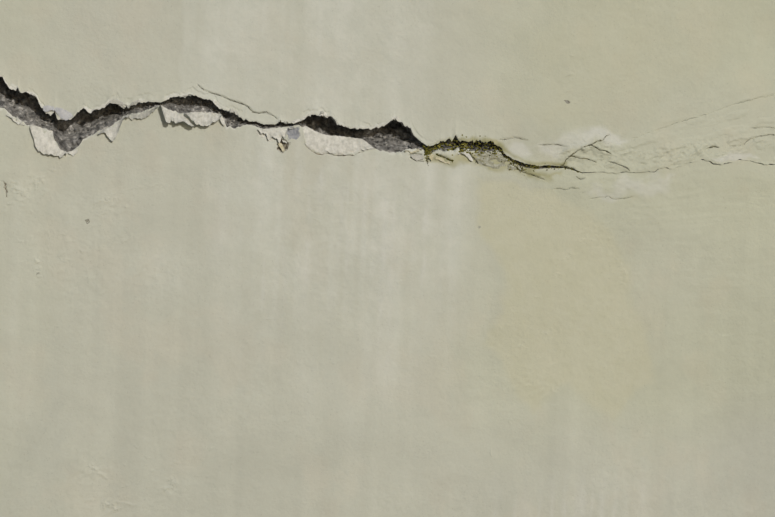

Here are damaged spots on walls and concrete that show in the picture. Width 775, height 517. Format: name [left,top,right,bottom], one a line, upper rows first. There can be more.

peeling [256,126,300,153]
crack [0,77,677,190]
crack [701,127,774,165]
leakage [86,0,554,478]